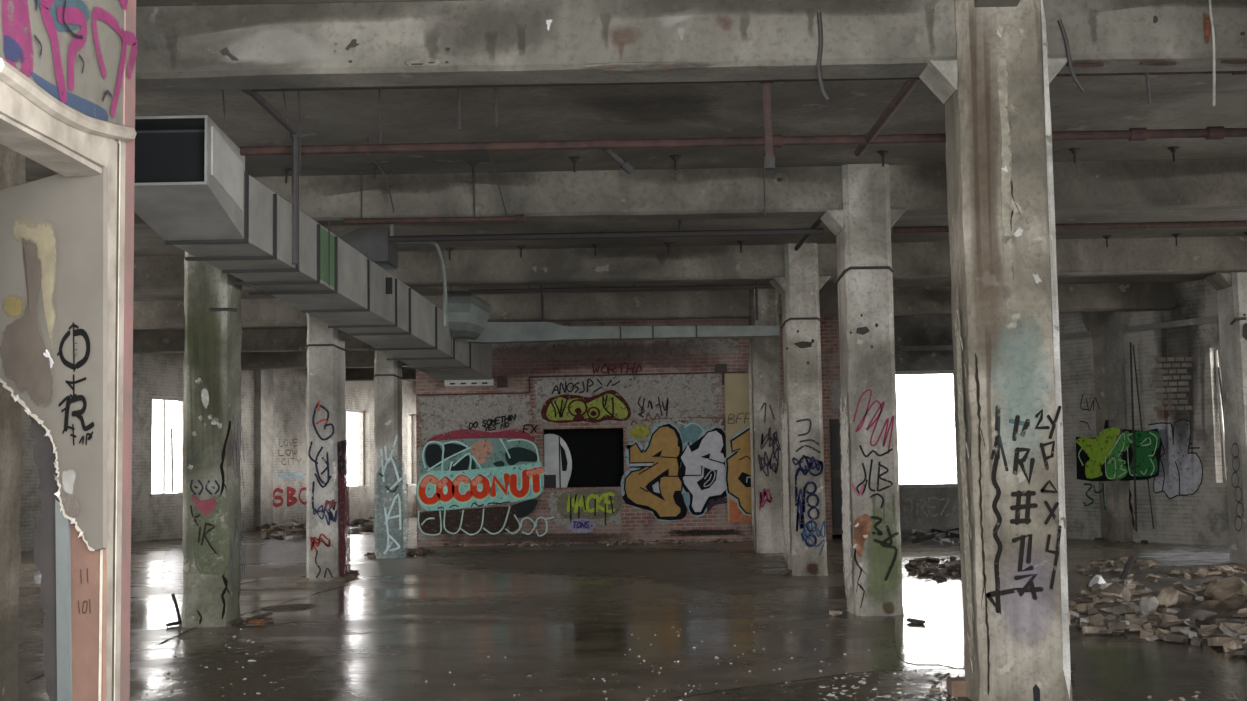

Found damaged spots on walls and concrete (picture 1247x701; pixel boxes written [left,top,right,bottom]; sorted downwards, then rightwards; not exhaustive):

spalling [0,378,95,551]